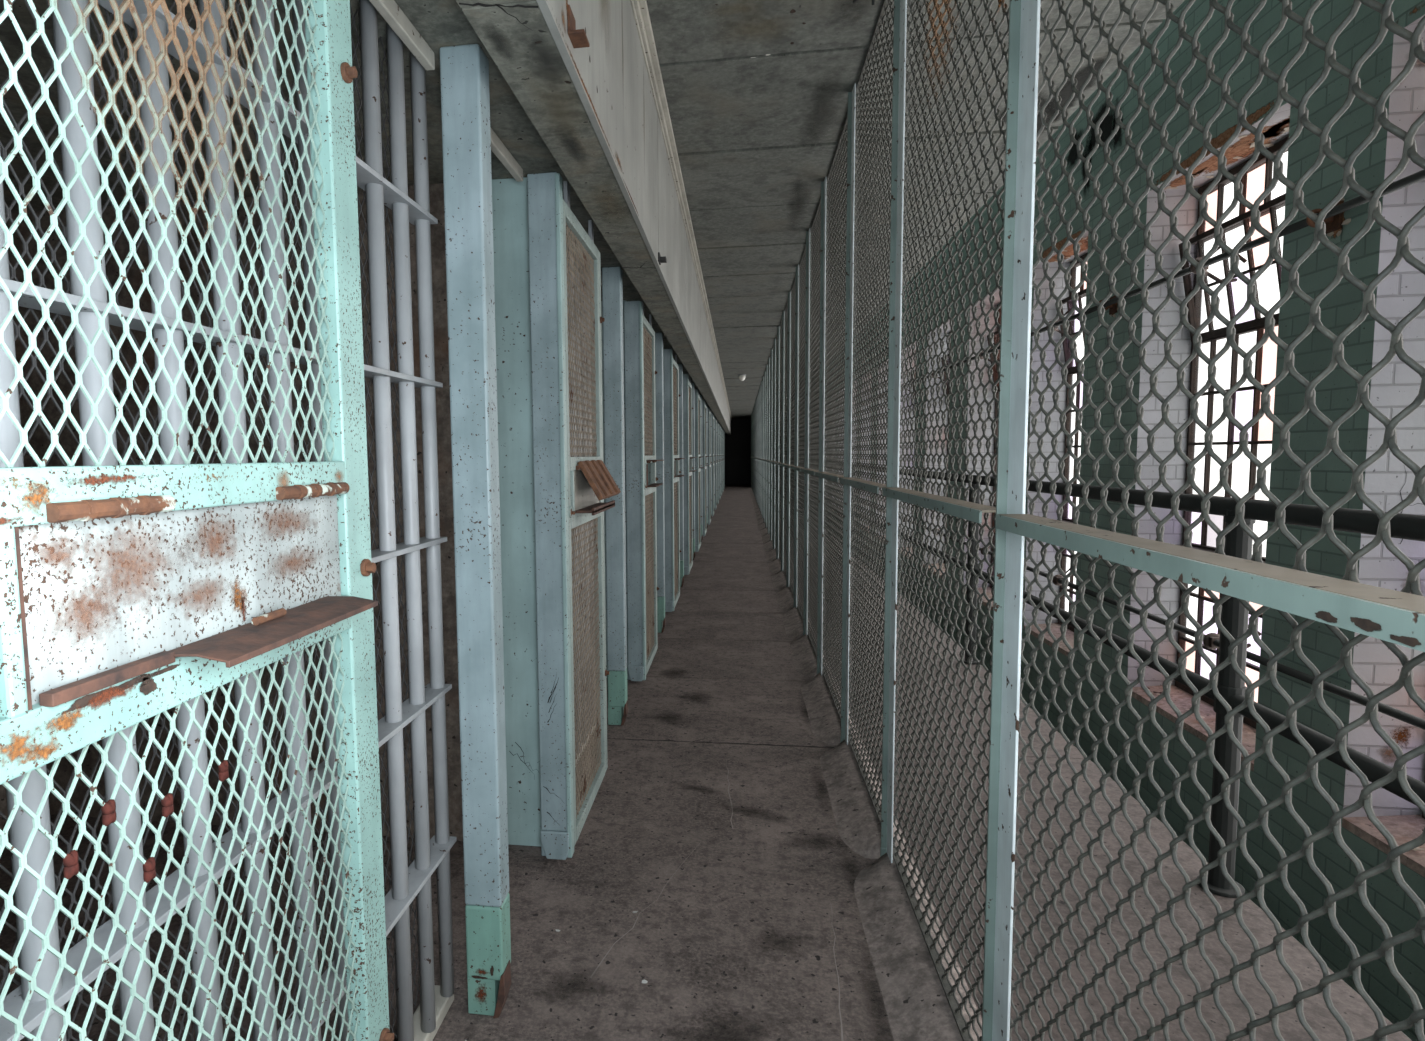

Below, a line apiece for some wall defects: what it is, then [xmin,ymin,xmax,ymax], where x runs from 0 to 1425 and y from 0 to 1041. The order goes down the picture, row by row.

rust [73,474,153,486]
rust [0,476,50,525]
rust [266,511,301,533]
rust [43,544,70,564]
rust [96,538,166,595]
rust [200,525,227,556]
rust [281,555,312,574]
rust [68,595,103,630]
rust [183,582,247,621]